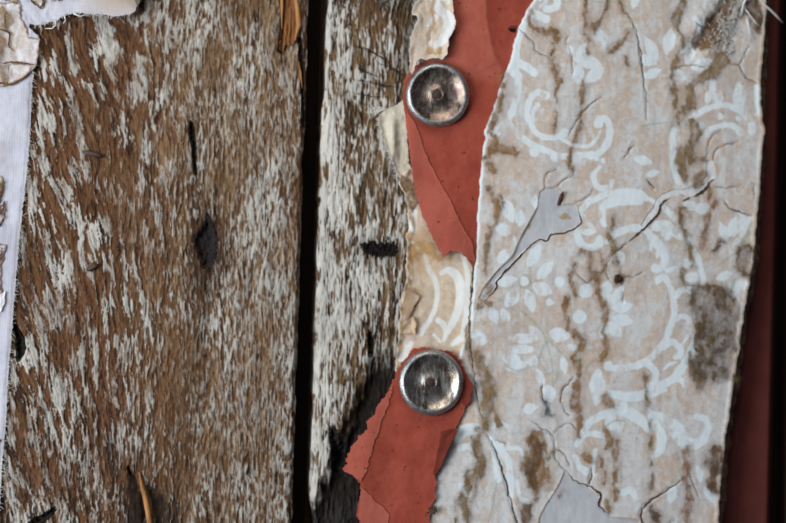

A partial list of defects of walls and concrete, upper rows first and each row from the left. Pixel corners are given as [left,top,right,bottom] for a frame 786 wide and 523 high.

peeling [0,0,40,87]
crack [628,14,647,120]
peeling [479,188,582,300]
crack [465,272,483,417]
leakage [678,207,740,389]
crack [491,441,517,523]
crack [534,376,610,517]
peeling [539,472,639,523]
crack [640,473,698,523]